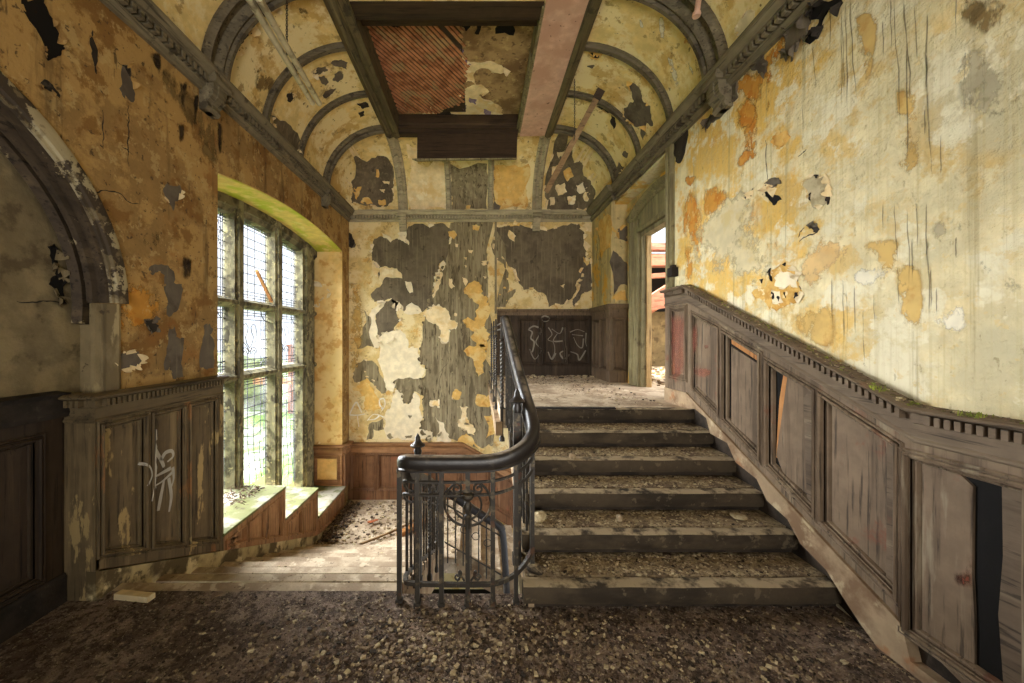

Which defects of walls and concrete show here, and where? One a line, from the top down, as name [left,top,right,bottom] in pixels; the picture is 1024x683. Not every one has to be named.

spalling [21,0,71,61]
damp [955,0,1003,33]
peeling [422,49,511,115]
peeling [597,81,653,139]
damp [829,2,942,170]
damp [961,52,1003,112]
spalling [801,174,832,233]
spalling [47,244,72,308]
peeling [144,264,187,380]
flaking render [346,134,628,451]
flaking render [694,177,804,312]
damp [796,208,965,346]